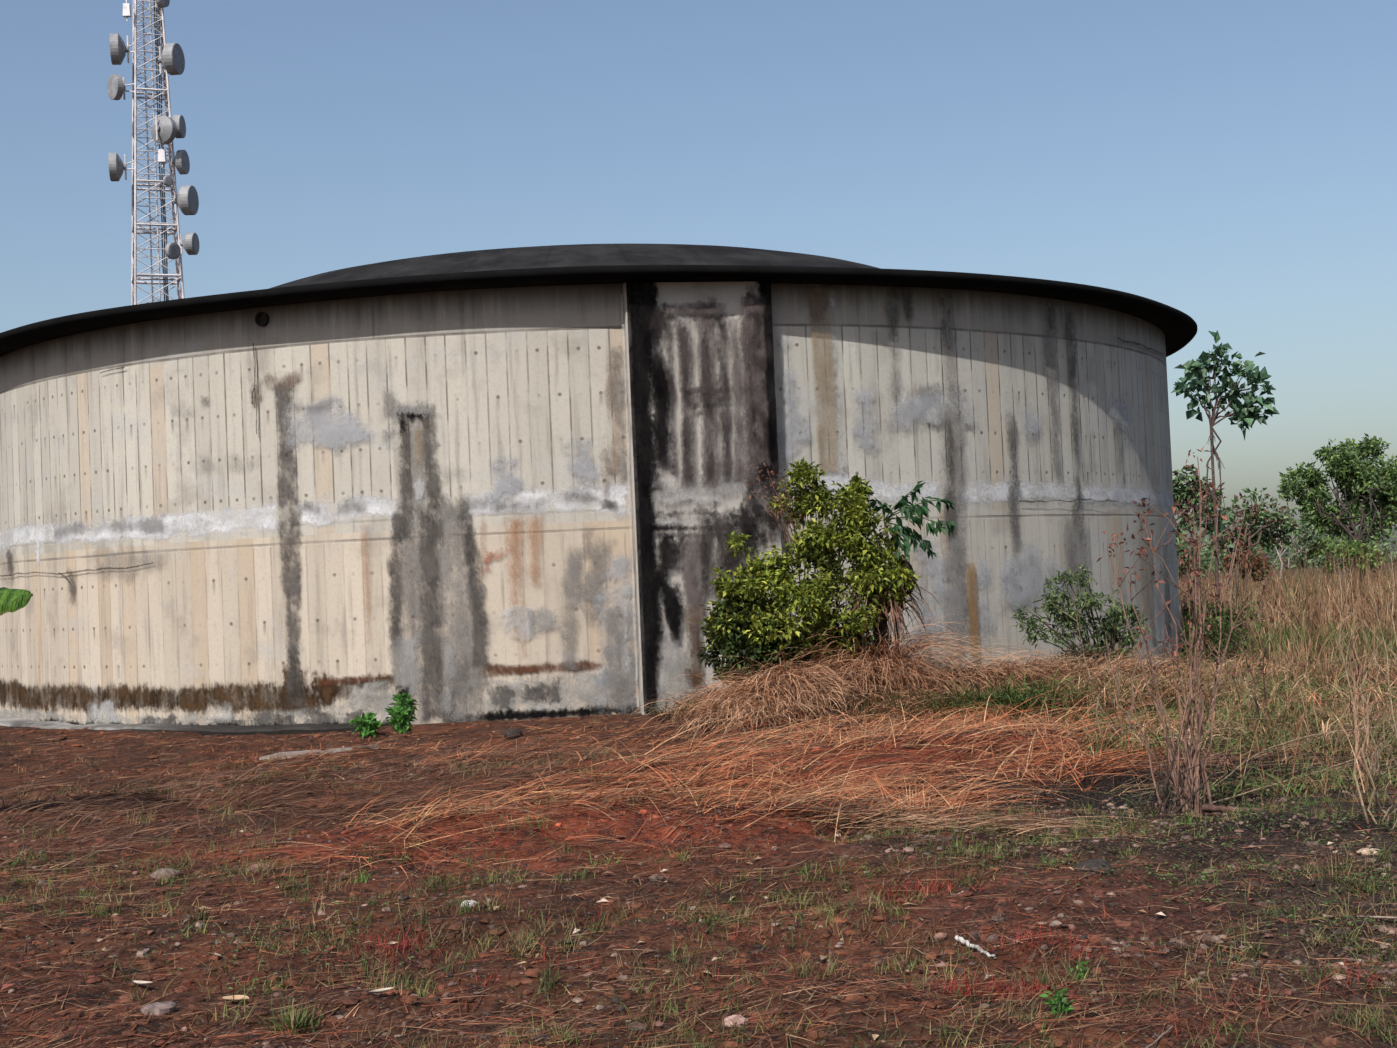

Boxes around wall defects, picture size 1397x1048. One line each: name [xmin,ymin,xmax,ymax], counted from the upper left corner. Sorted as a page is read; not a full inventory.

damp [0,279,874,725]
damp [887,286,1089,651]